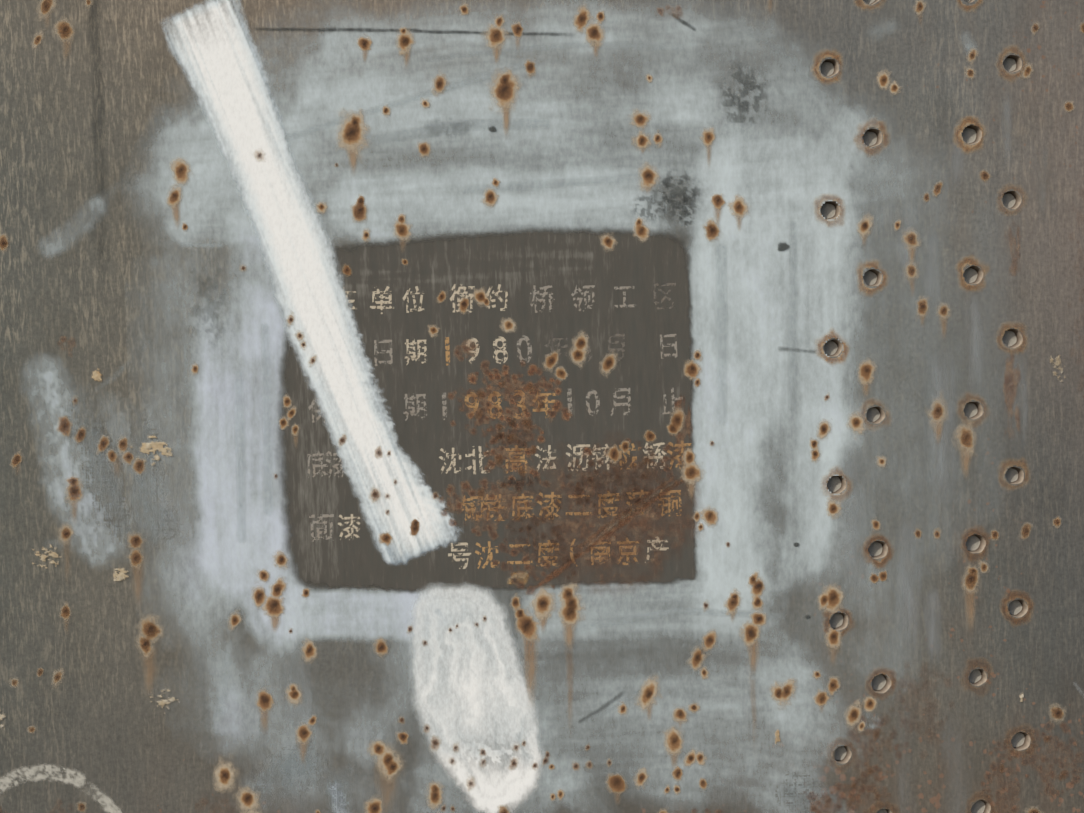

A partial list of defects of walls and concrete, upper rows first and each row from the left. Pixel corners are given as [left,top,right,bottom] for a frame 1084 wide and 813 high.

rust [358,37,372,57]
rust [486,16,523,59]
rust [574,7,604,52]
rust [422,76,446,107]
rust [492,70,518,128]
rust [338,113,367,167]
rust [684,350,701,387]
rust [434,333,588,545]
rust [662,401,701,494]
rust [810,421,830,461]
rust [694,509,718,531]
rust [215,763,258,813]